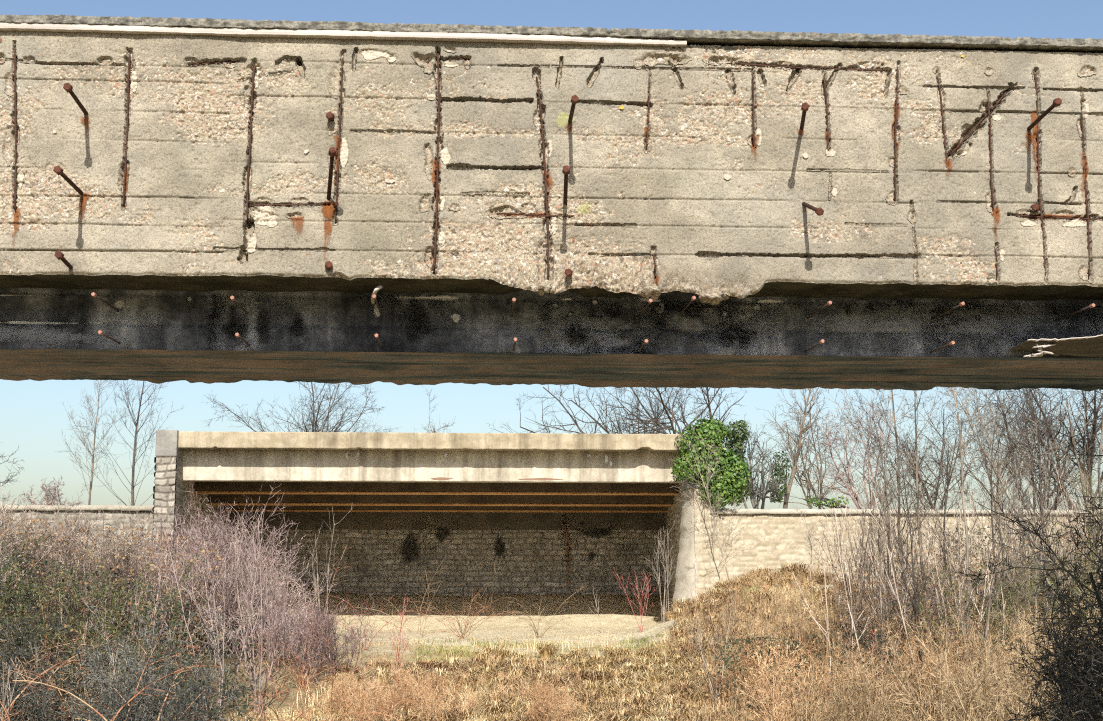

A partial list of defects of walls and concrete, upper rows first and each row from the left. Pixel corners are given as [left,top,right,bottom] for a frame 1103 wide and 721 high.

spalling [93,56,114,66]
peeling [533,107,548,151]
peeling [961,123,972,138]
rust [1026,111,1038,160]
peeling [423,143,434,180]
rust [323,204,336,250]
spalling [493,240,765,305]
damp [210,308,270,344]
damp [291,317,304,336]
damp [400,296,457,339]
damp [723,311,755,345]
damp [945,311,1034,338]